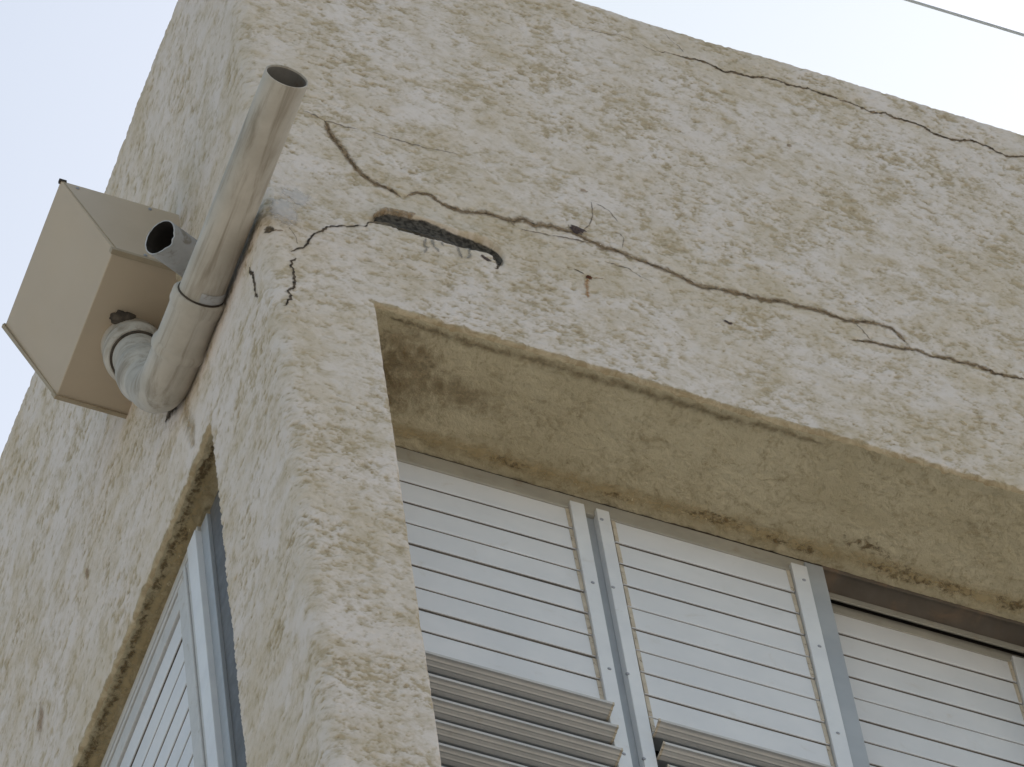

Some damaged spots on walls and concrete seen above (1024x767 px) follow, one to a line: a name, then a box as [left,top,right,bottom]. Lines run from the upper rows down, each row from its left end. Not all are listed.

crack [595,31,1024,158]
crack [249,267,258,297]
crack [286,222,373,305]
flaking render [373,207,503,269]
crack [305,111,1024,379]
water stain [383,339,432,406]
water stain [393,427,1023,610]
water stain [78,446,216,767]